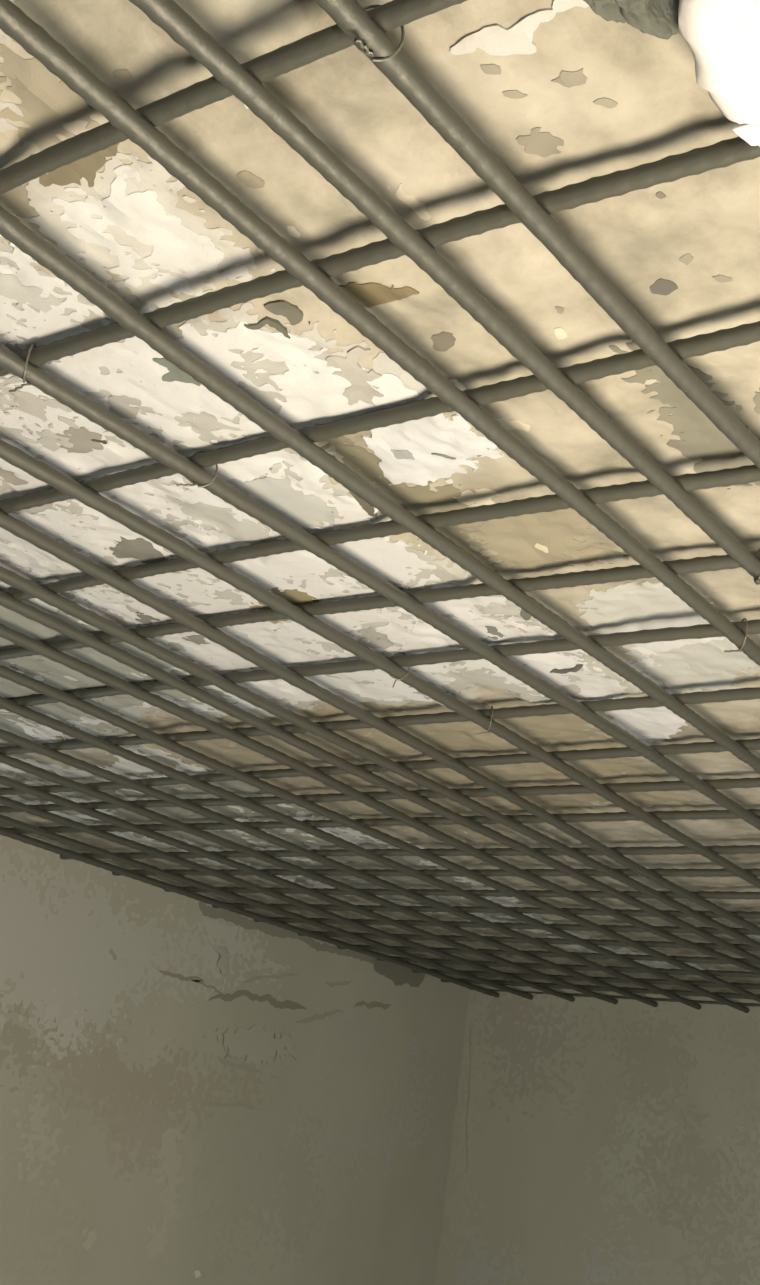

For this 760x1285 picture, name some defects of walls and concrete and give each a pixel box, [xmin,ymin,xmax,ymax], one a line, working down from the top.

crack [159,970,391,1024]
spalling [0,0,760,1013]